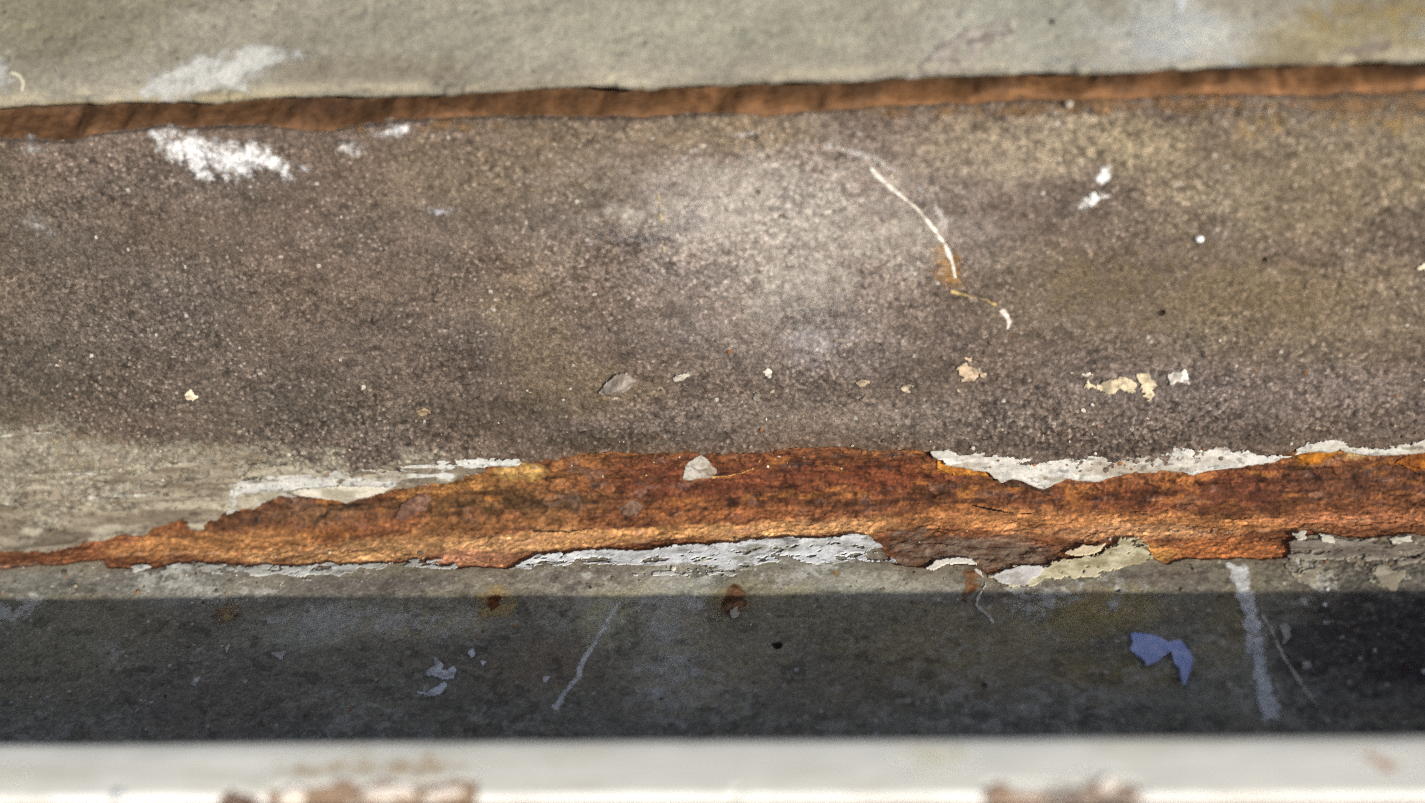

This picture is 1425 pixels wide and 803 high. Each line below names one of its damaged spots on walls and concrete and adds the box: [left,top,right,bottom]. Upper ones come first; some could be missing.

efflorescence [152,132,288,180]
spalling [0,416,1425,589]
rust [476,585,517,619]
rust [710,584,751,620]
rust [961,568,994,624]
peeling [1279,623,1292,643]